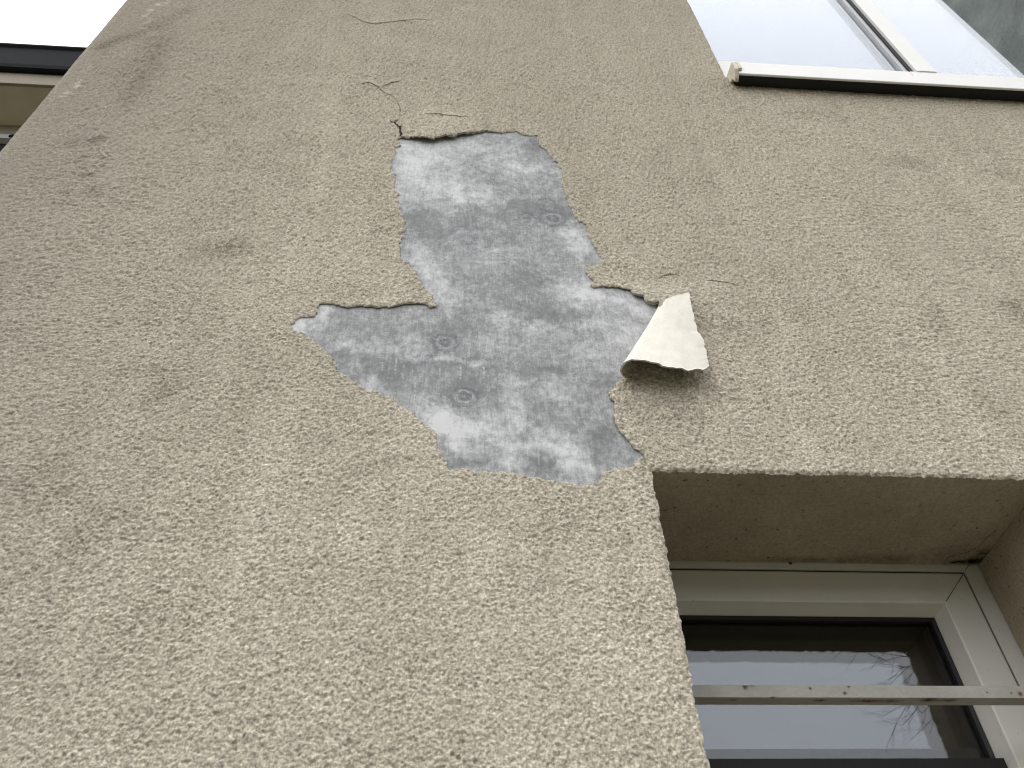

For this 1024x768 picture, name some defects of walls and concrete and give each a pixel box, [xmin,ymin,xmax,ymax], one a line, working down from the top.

crack [343,11,438,24]
crack [356,78,476,136]
peeling [290,131,709,485]